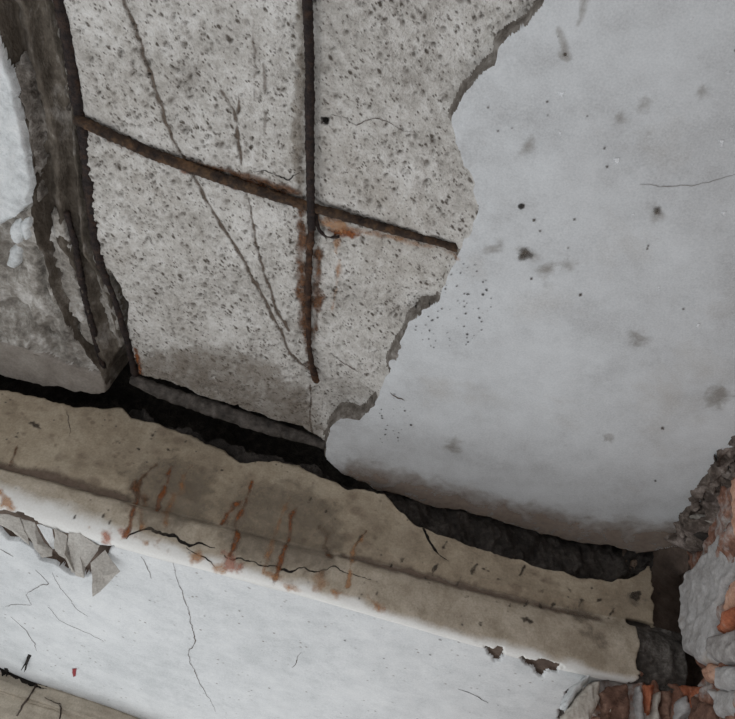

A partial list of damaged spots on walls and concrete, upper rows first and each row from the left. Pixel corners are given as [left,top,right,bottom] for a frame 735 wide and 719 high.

corrosion [188,160,303,200]
spalling [0,0,544,490]
corrosion [318,217,359,242]
corrosion [295,209,324,369]
corrosion [123,464,157,538]
spalling [664,435,735,554]
peeling [0,510,120,596]
crack [126,527,371,580]
crack [420,522,447,560]
crack [5,573,104,651]
spalling [598,581,735,719]
crack [0,668,62,719]